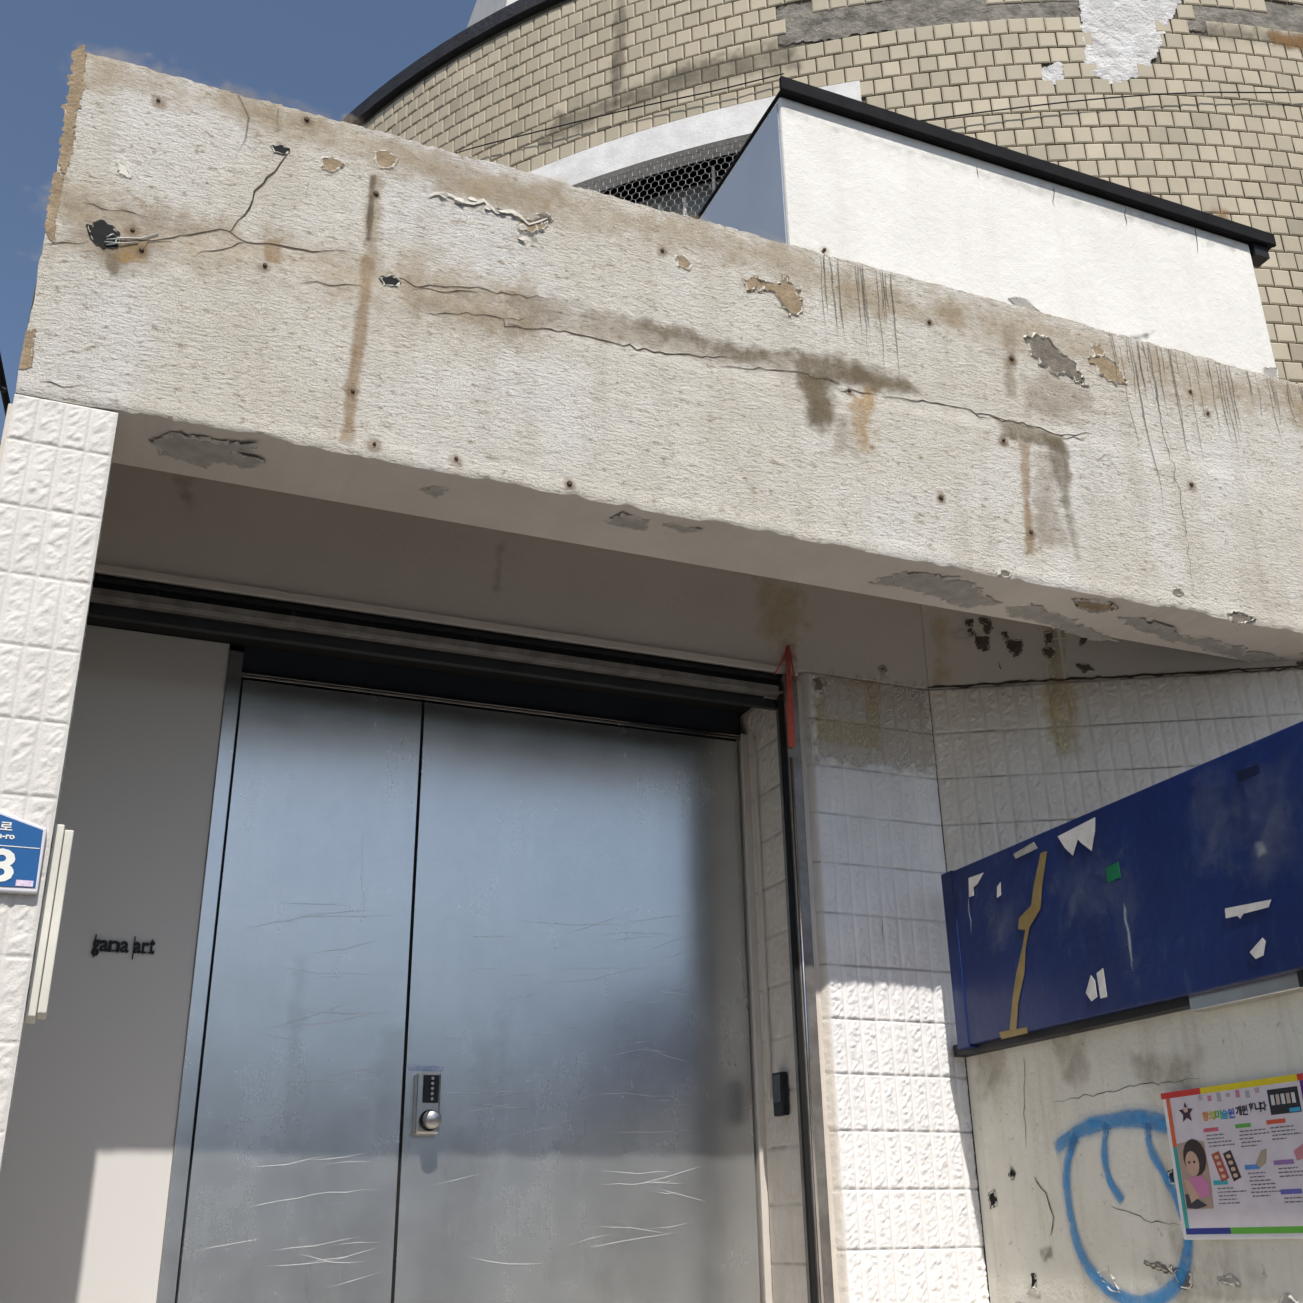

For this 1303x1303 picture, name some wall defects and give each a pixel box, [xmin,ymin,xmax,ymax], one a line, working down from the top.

crack [83,147,361,286]
peeling [428,192,554,243]
peeling [742,274,804,317]
crack [398,277,1092,440]
peeling [1023,332,1128,388]
damp [800,359,910,422]
peeling [148,432,267,470]
peeling [997,569,1012,579]
peeling [869,571,1303,669]
peeling [1076,664,1095,674]